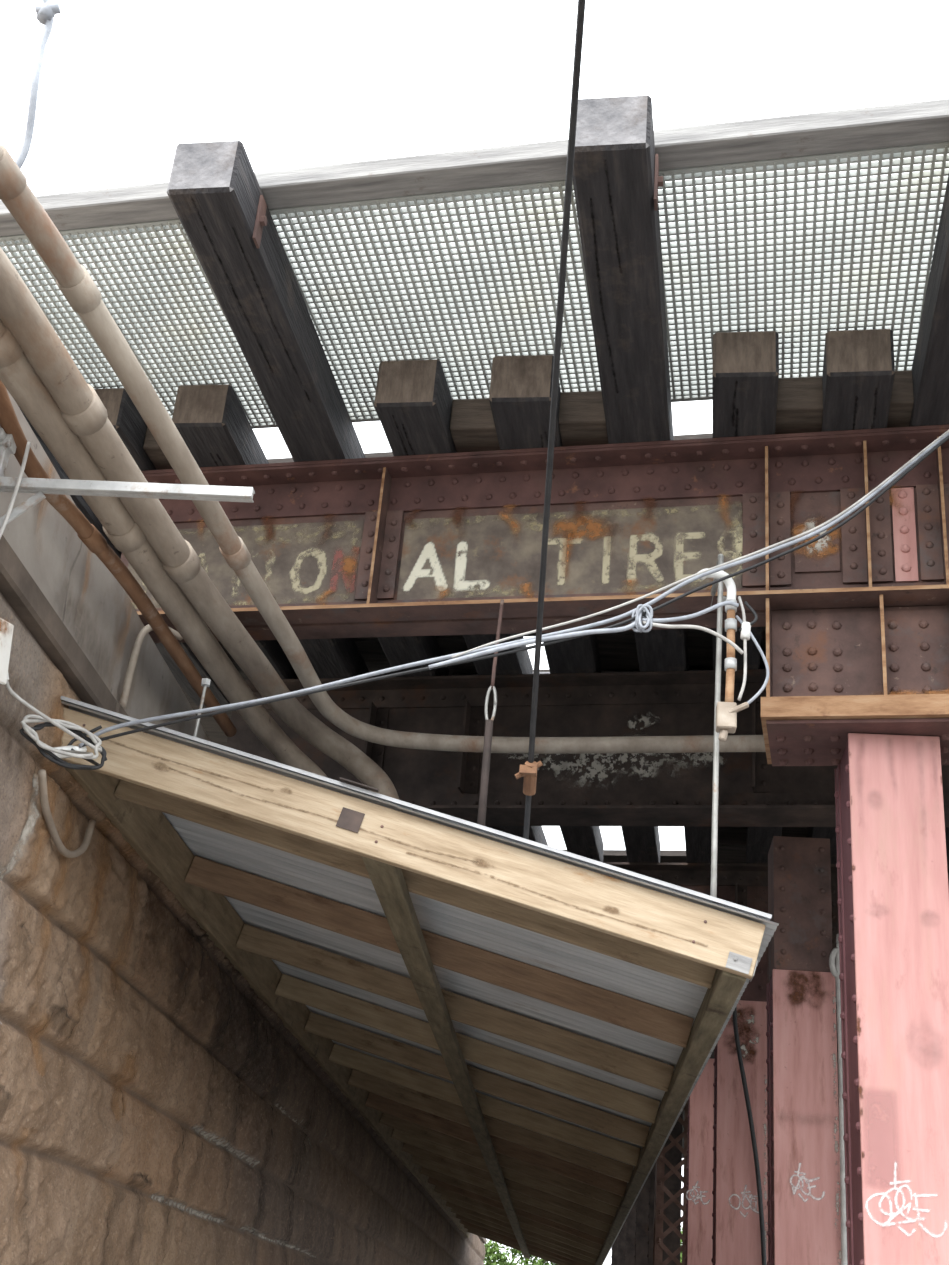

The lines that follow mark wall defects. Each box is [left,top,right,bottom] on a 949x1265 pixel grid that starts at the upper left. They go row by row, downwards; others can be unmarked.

rust [555,501,608,562]
rust [790,491,838,556]
peeling [628,716,655,729]
peeling [509,752,723,785]
rust [788,972,825,1004]